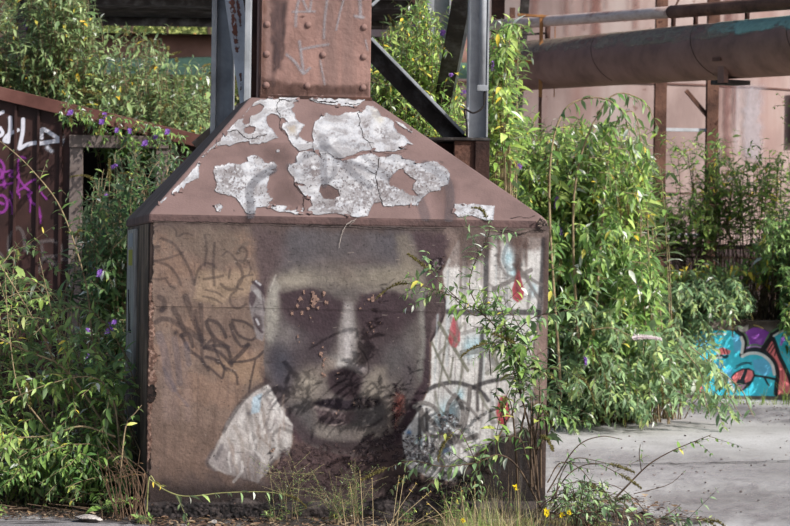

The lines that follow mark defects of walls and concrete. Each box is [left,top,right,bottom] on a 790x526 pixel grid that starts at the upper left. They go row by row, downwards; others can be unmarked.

corrosion [271,0,287,69]
corrosion [263,80,367,95]
peeling [158,94,450,217]
peeling [452,203,495,220]